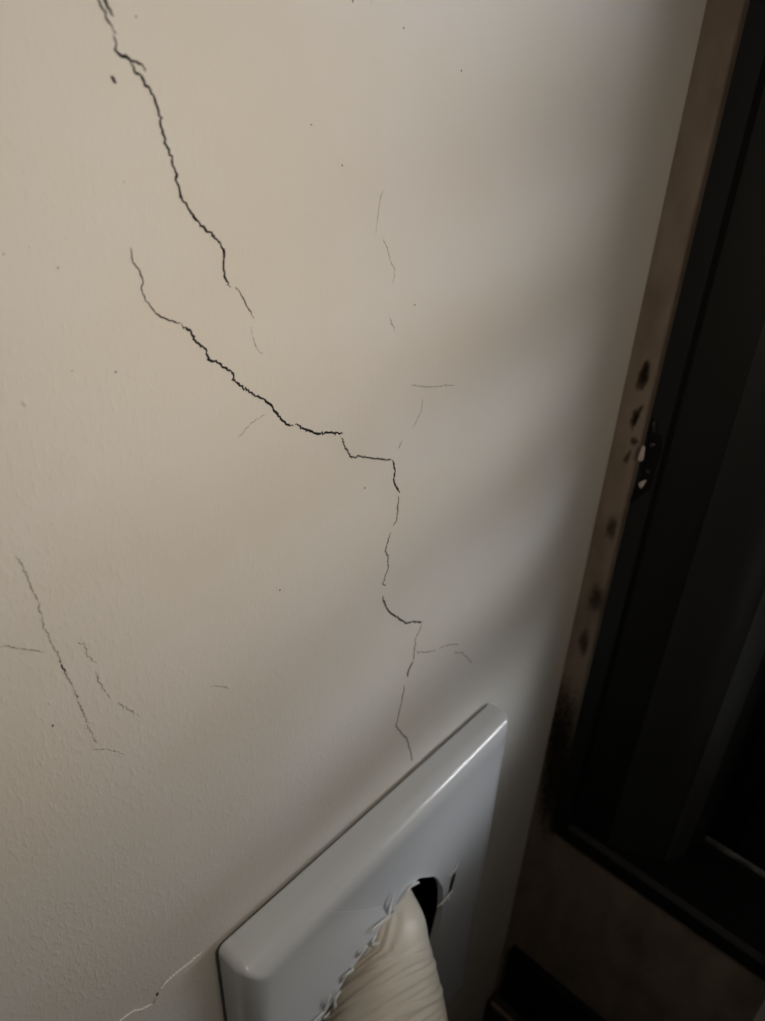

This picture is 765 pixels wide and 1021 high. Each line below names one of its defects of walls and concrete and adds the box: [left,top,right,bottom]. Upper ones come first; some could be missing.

crack [98,0,254,318]
crack [131,250,422,761]